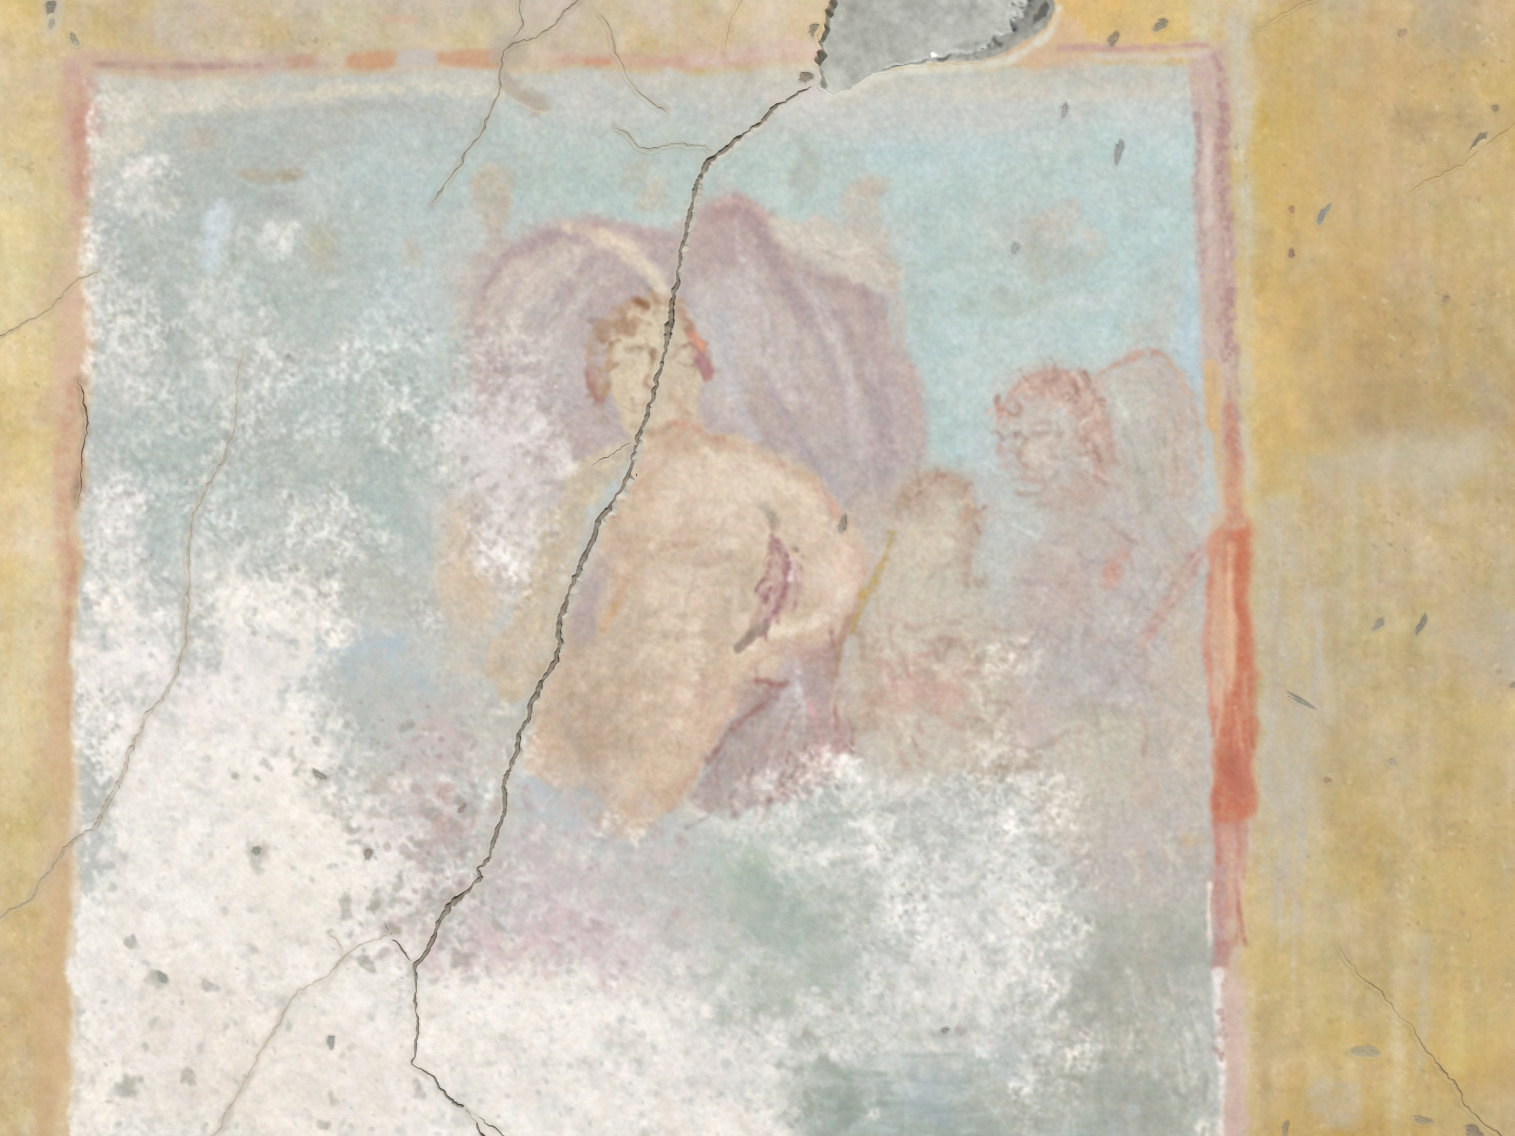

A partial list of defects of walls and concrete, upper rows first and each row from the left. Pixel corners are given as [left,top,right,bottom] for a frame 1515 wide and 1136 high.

flaking render [751,0,1058,134]
crack [0,267,103,344]
crack [0,349,247,923]
crack [207,0,815,1136]
crack [1333,942,1506,1136]